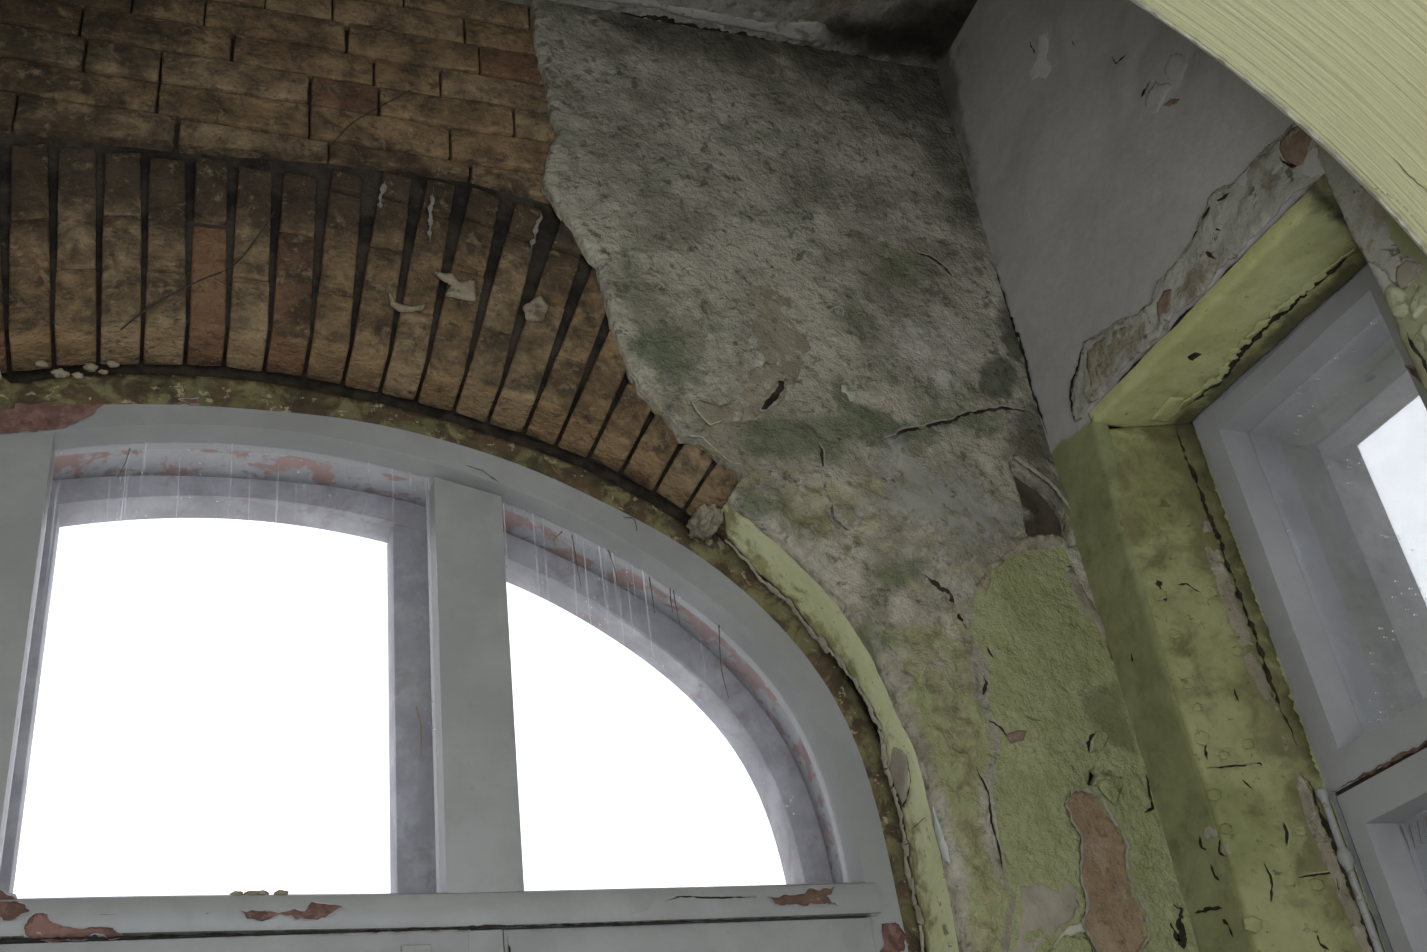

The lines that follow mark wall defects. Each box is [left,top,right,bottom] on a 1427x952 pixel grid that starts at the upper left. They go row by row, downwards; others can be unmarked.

damp [830,0,973,58]
crack [1393,159,1427,192]
damp [427,188,435,242]
damp [434,272,476,302]
damp [523,294,549,322]
crack [917,251,954,276]
spalling [1069,123,1324,422]
crack [884,266,1047,439]
peeling [0,401,103,435]
spalling [725,539,951,952]
peeling [0,889,124,944]
peeling [240,901,344,922]